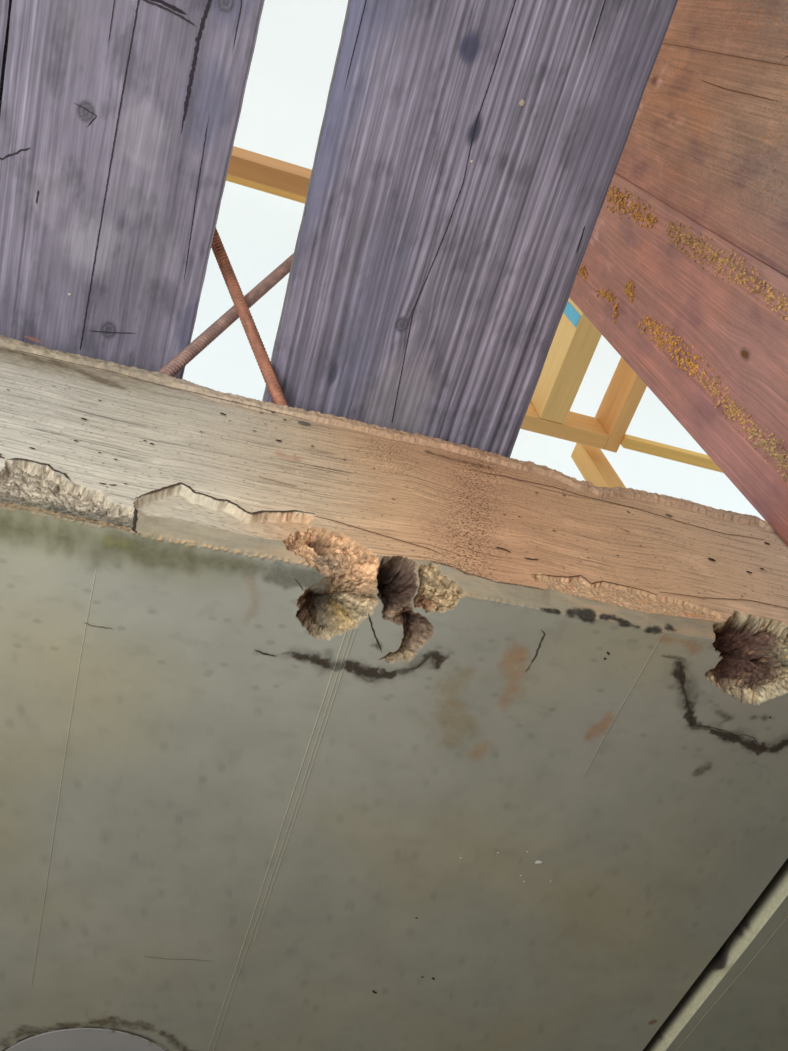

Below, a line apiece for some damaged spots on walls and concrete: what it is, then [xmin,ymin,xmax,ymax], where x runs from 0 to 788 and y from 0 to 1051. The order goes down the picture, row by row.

spalling [0,447,466,664]
water stain [293,653,330,668]
water stain [345,652,444,678]
water stain [669,657,788,755]